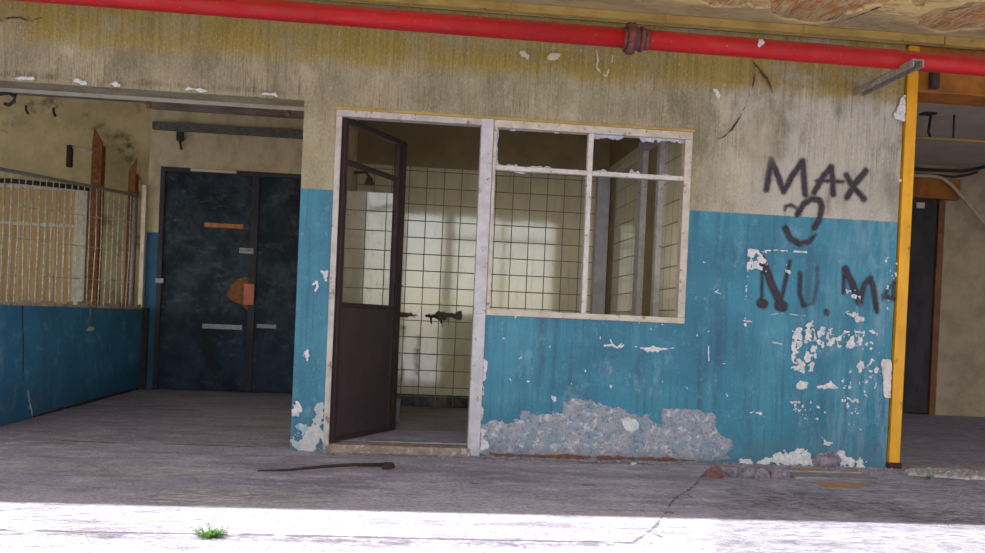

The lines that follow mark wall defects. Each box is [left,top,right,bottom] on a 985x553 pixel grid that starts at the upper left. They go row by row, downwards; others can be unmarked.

flaking render [702,0,887,22]
flaking render [913,0,985,31]
crack [718,62,773,139]
peeling [745,249,807,297]
peeling [600,336,673,352]
peeling [771,311,892,430]
peeling [290,401,325,451]
flaking render [480,395,867,472]
crack [36,528,166,536]
crack [191,475,704,543]